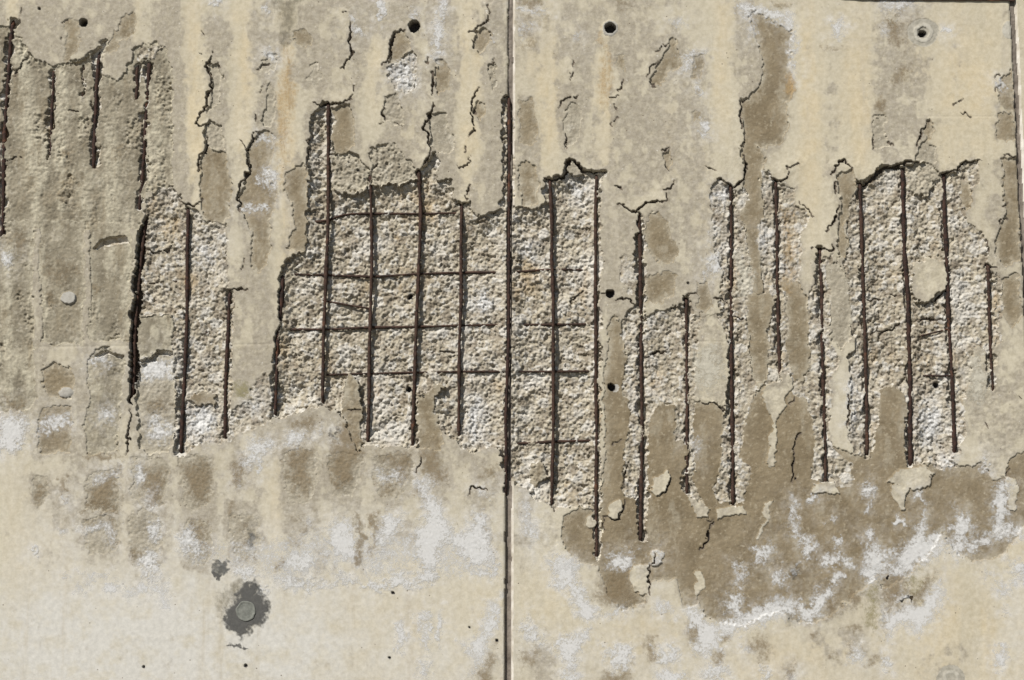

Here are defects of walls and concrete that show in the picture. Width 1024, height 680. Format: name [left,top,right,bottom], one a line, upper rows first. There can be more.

crack [197,32,221,172]
crack [237,64,270,212]
crack [379,57,436,167]
crack [454,87,480,205]
crack [544,134,675,214]
leakage [734,3,800,69]
spalling [0,12,512,511]
peeling [509,12,1024,625]
leakage [60,465,170,609]
leakage [233,418,321,487]
leakage [175,452,499,594]
leakage [648,478,1024,680]